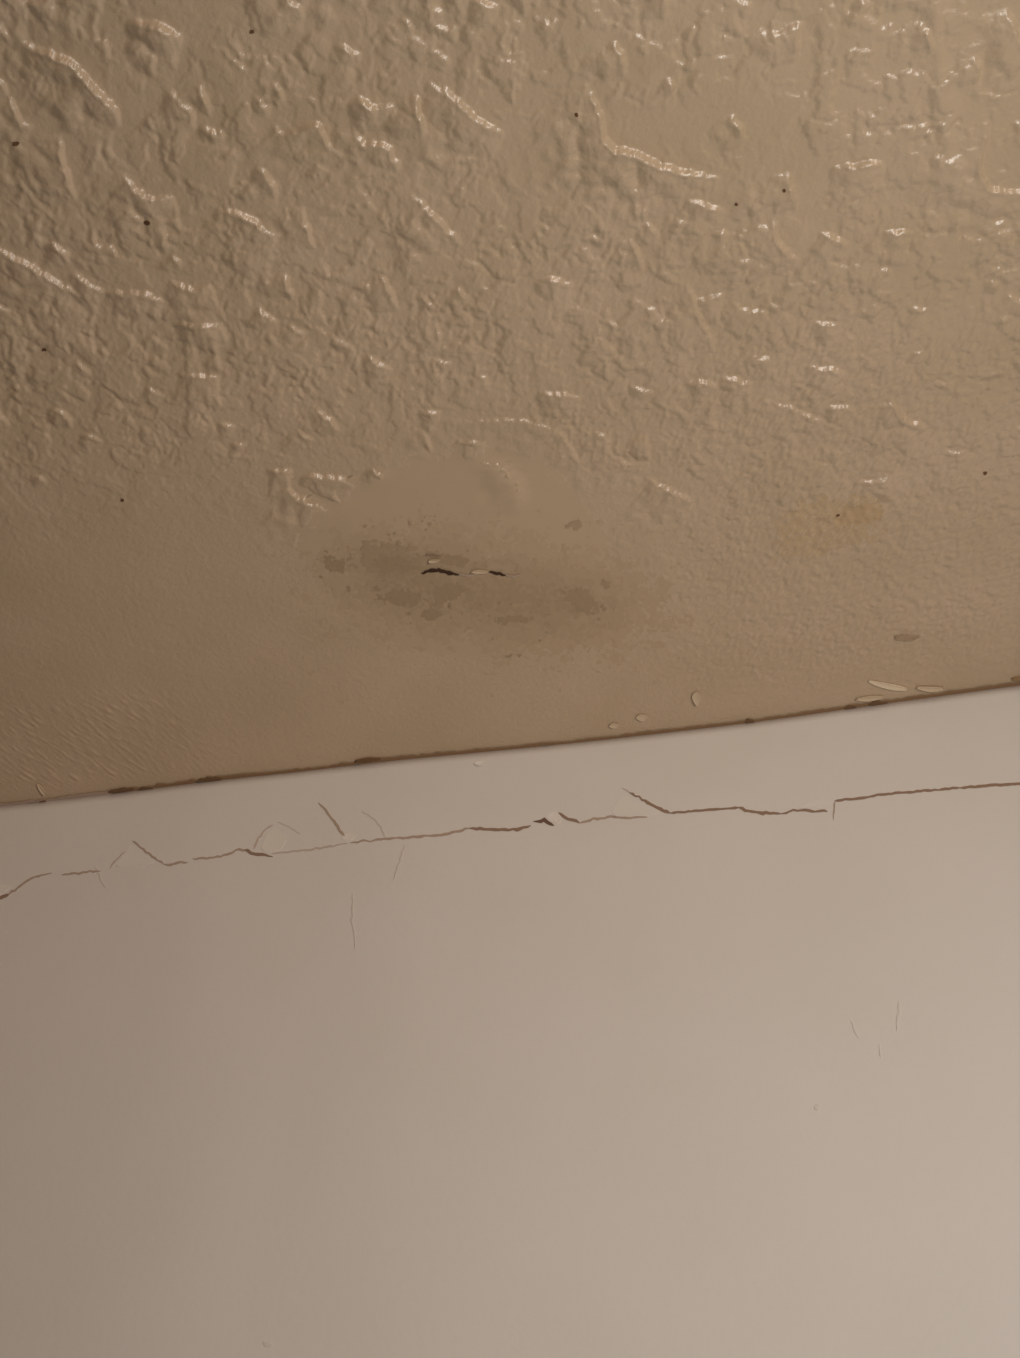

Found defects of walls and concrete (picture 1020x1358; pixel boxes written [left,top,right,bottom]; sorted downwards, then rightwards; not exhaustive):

crack [421,554,506,576]
damp [271,491,728,675]
crack [0,683,1020,806]
crack [0,782,1020,900]